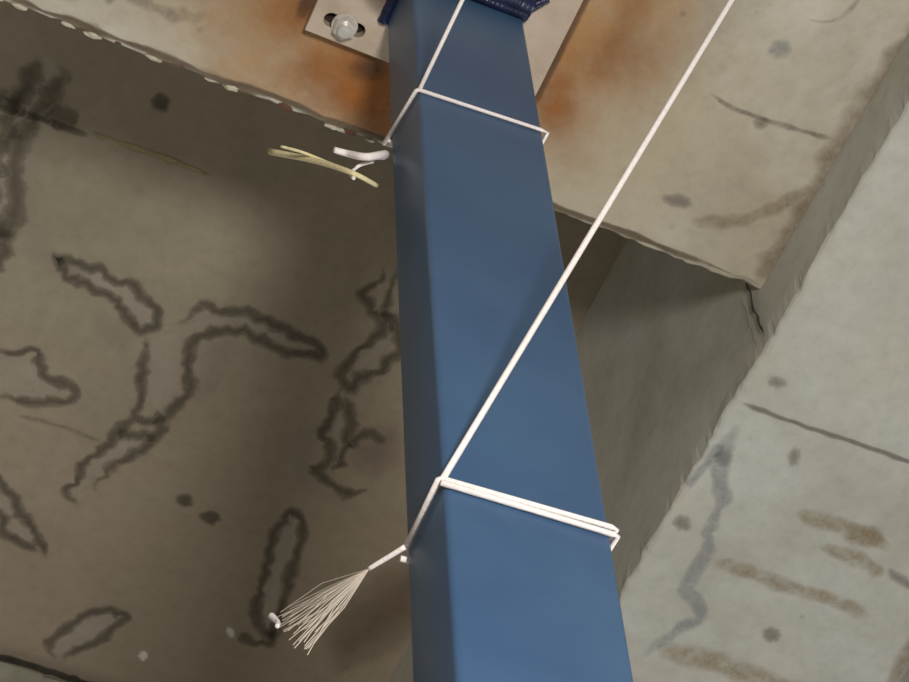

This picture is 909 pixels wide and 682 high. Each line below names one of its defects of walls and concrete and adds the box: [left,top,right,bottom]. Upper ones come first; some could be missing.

corrosion [248,0,391,133]
corrosion [535,0,650,118]
damp [0,66,77,261]
crack [755,408,909,462]